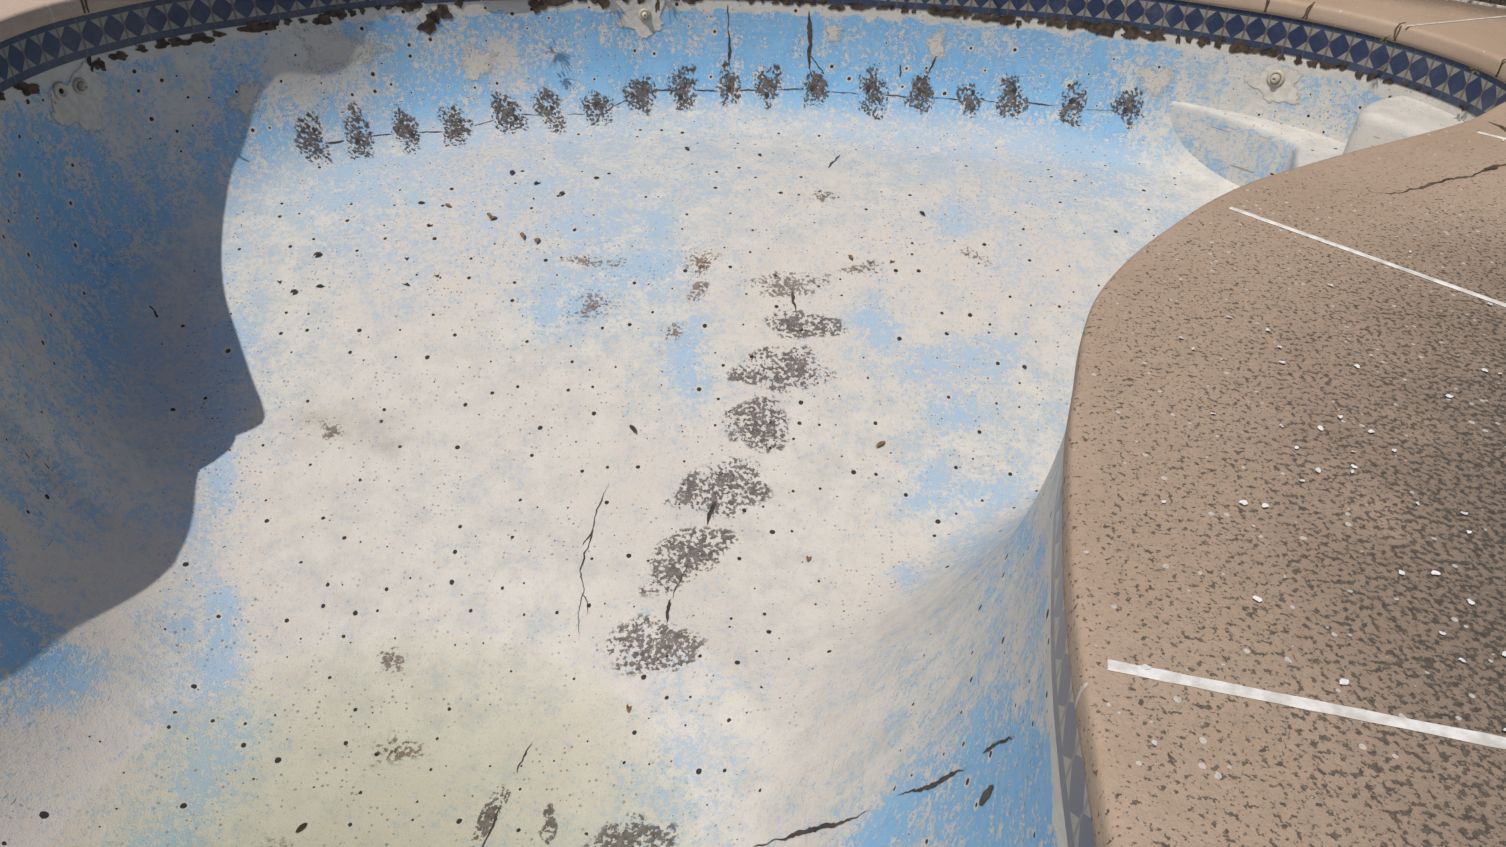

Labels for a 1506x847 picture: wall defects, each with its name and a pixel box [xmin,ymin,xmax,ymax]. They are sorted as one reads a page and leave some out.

spalling [87,0,463,72]
spalling [528,0,703,14]
crack [613,5,1047,106]
spalling [737,0,1431,119]
spalling [1059,81,1087,127]
peeling [1111,67,1172,129]
crack [1377,122,1506,194]
crack [578,484,609,632]
crack [754,736,1014,847]